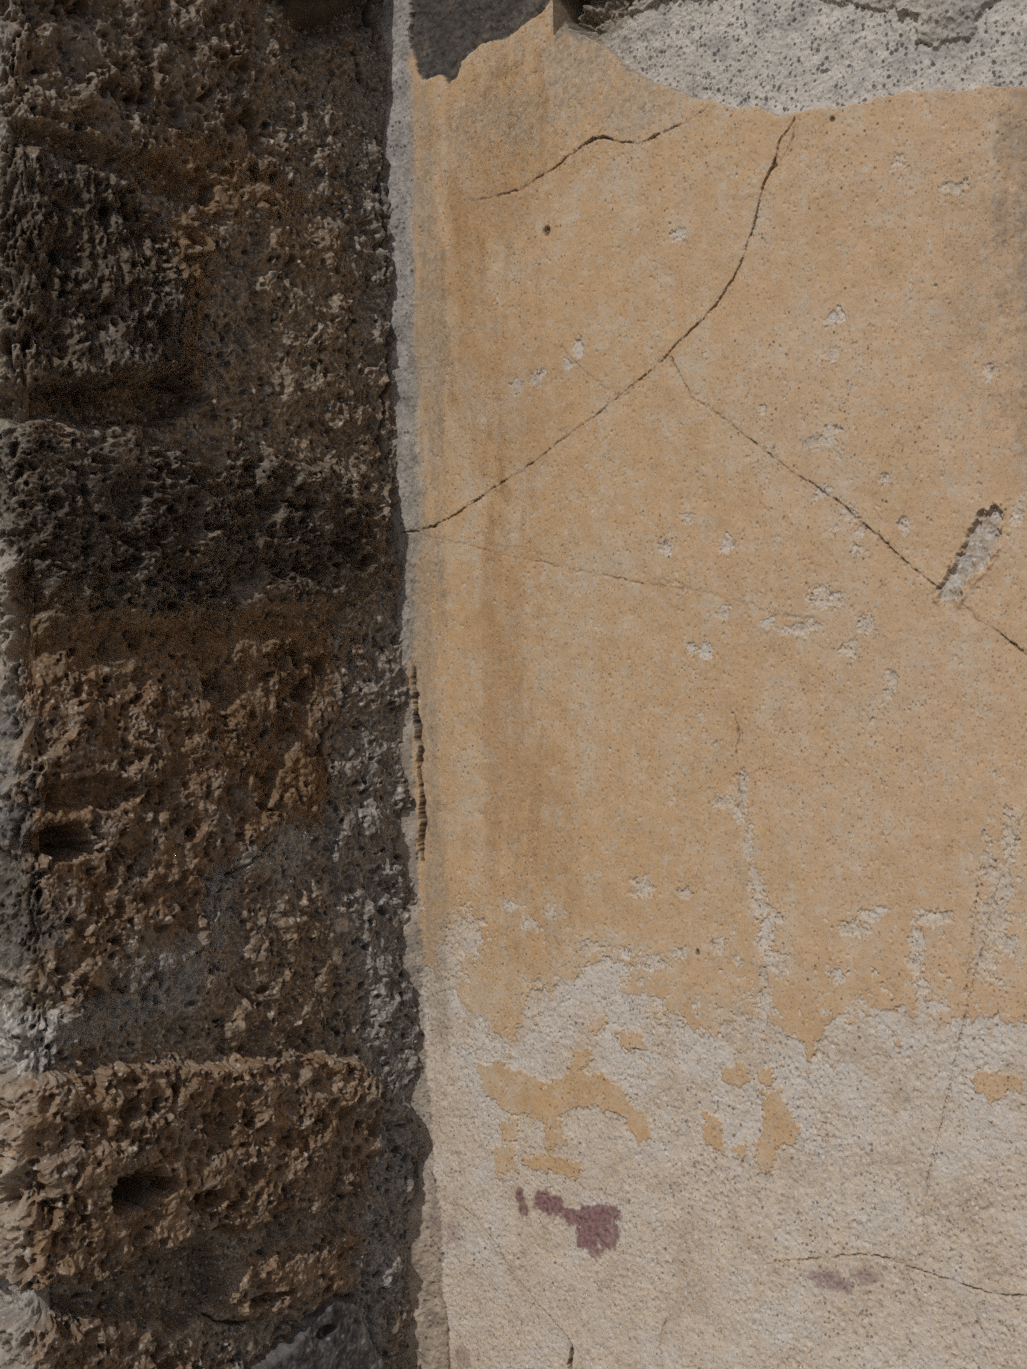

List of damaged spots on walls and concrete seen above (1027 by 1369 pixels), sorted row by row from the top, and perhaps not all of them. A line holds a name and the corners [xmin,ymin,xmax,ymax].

spalling [568,0,1027,116]
crack [401,106,1027,655]
crack [411,663,428,862]
flaking render [420,767,1027,1369]
crack [922,807,1027,1235]
crack [764,1252,1027,1315]